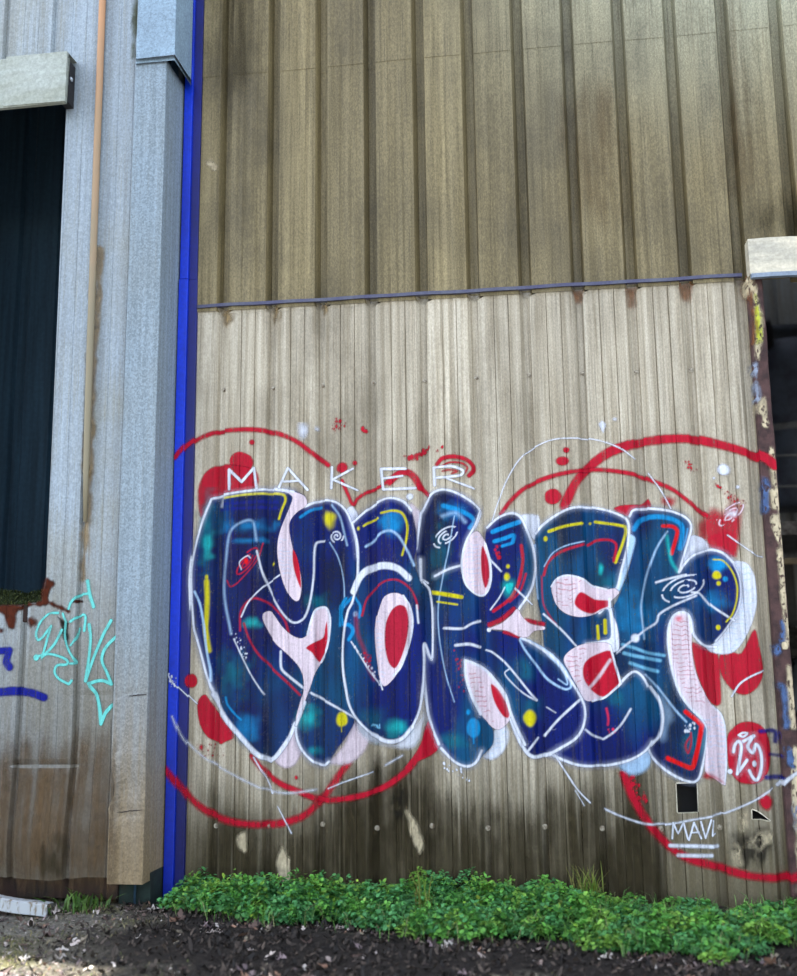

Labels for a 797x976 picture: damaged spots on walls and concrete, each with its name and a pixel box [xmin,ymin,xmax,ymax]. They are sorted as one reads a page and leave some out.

rust [0,578,83,632]